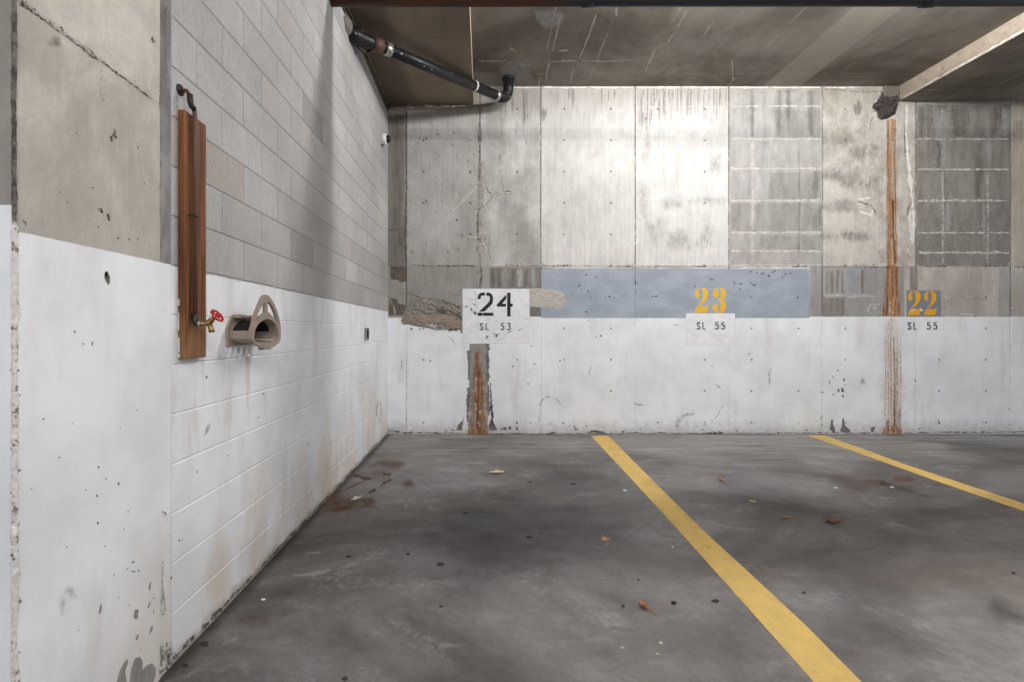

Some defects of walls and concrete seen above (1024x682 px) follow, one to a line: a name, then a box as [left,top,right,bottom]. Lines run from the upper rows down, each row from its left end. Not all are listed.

spalling [870,86,901,129]
crack [388,112,1024,330]
spalling [401,297,463,333]
corrosion [878,119,908,434]
corrosion [464,347,491,434]